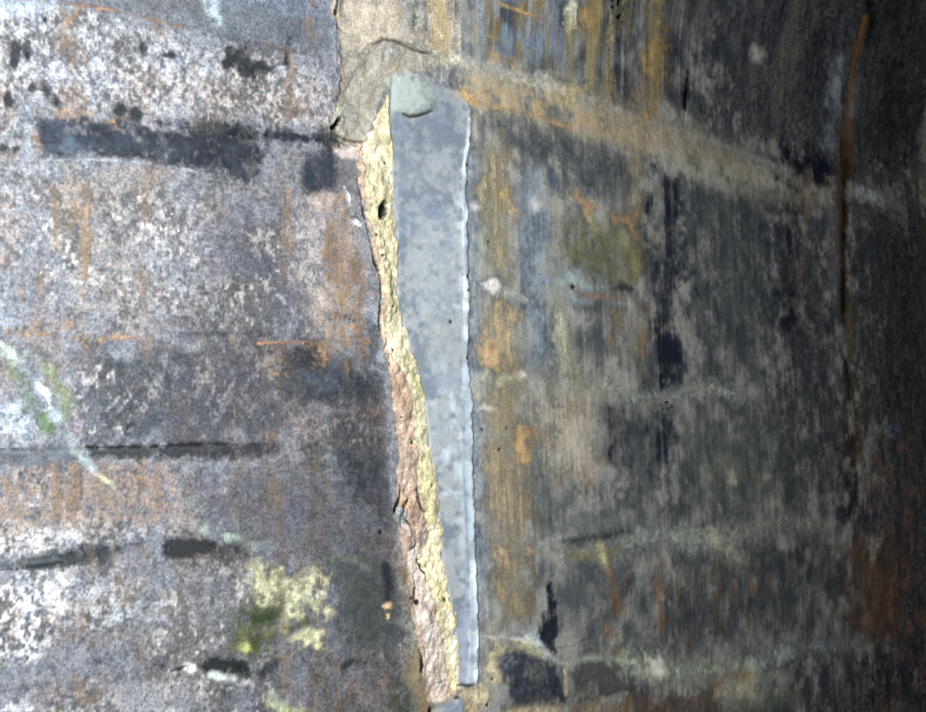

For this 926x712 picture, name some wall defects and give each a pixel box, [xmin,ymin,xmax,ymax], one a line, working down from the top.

damp [10,40,30,68]
damp [222,46,271,76]
damp [38,105,340,195]
corrosion [822,0,874,400]
spalling [330,0,488,712]
damp [154,524,401,681]
damp [495,582,860,712]